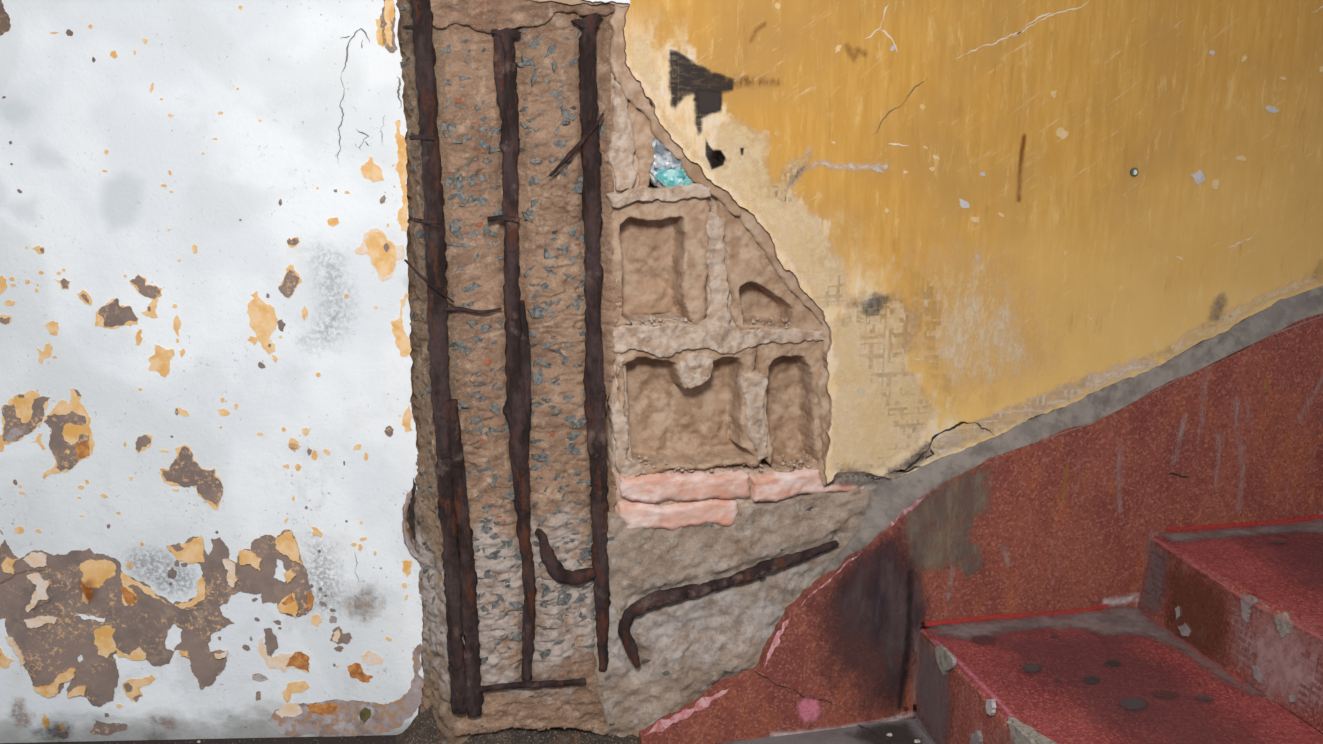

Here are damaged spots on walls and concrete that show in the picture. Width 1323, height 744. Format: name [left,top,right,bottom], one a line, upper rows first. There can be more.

crack [336,28,402,164]
rust [493,34,505,121]
spalling [0,0,888,744]
rust [520,300,532,428]
damp [836,444,930,482]
crack [887,421,995,474]
damp [772,472,1323,744]